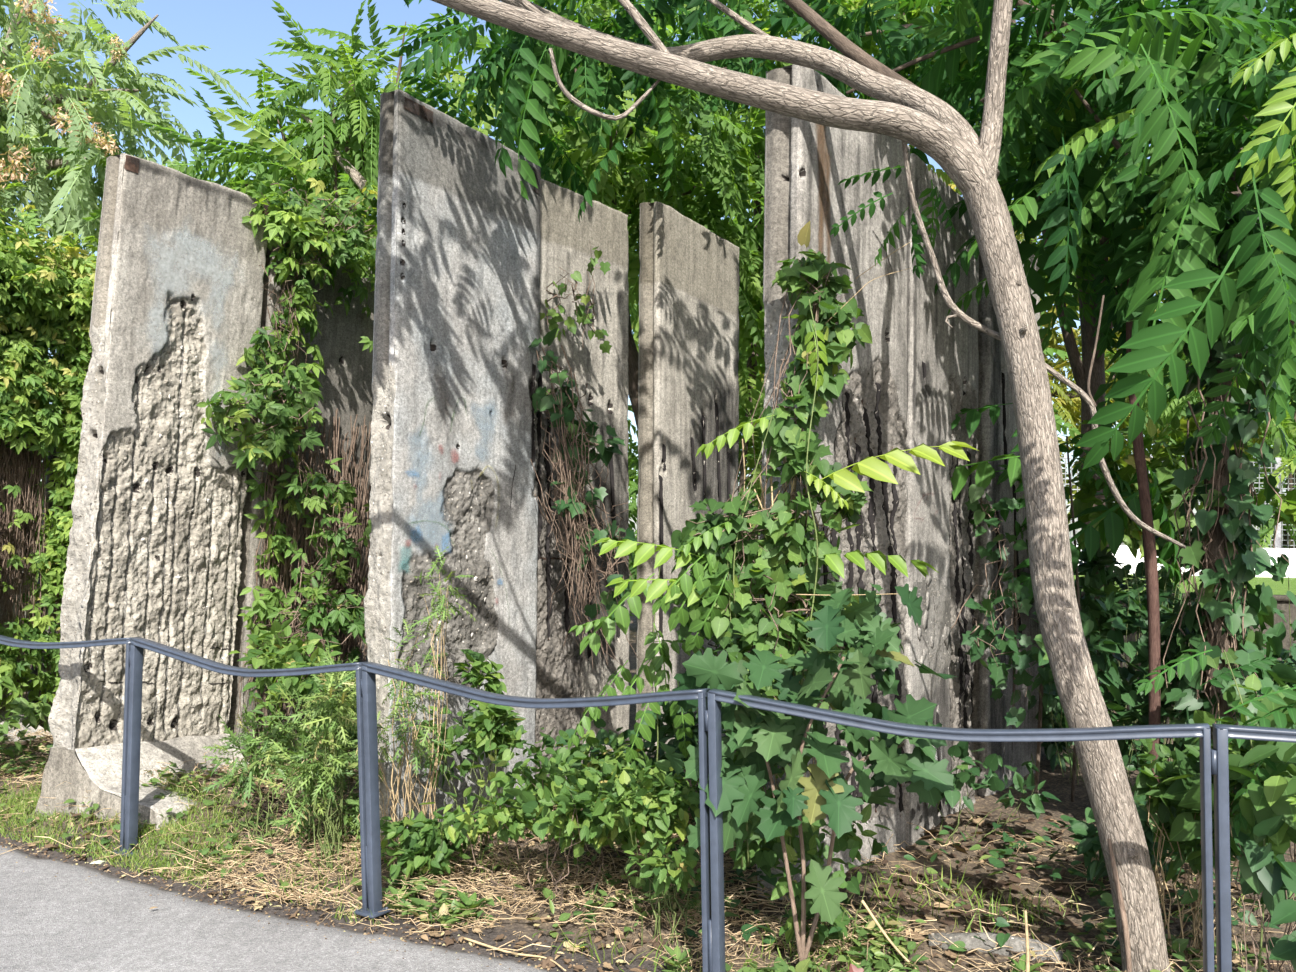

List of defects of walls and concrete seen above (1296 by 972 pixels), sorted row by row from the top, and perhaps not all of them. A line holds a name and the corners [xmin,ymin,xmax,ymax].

damp [908,296,932,403]
spalling [48,231,248,752]
damp [589,425,628,656]
damp [689,387,739,516]
damp [991,306,1005,663]
damp [924,679,952,772]
damp [990,677,1005,772]